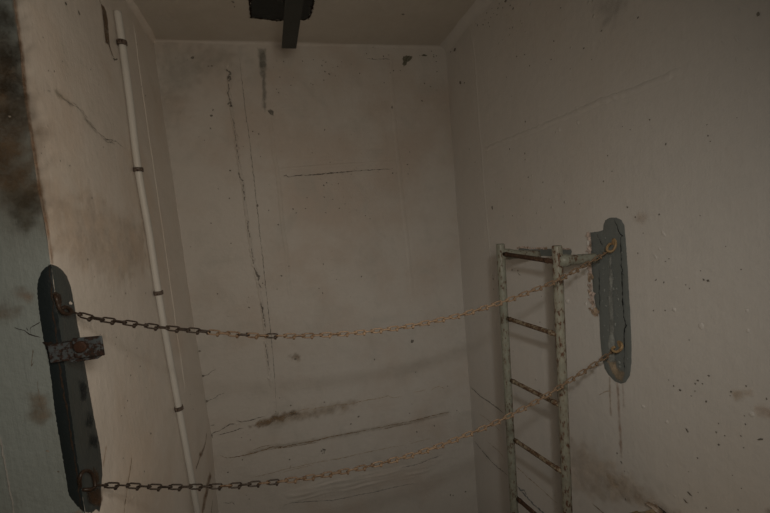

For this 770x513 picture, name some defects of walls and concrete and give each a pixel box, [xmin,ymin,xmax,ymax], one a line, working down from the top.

crack [211,64,397,438]
crack [220,412,449,476]